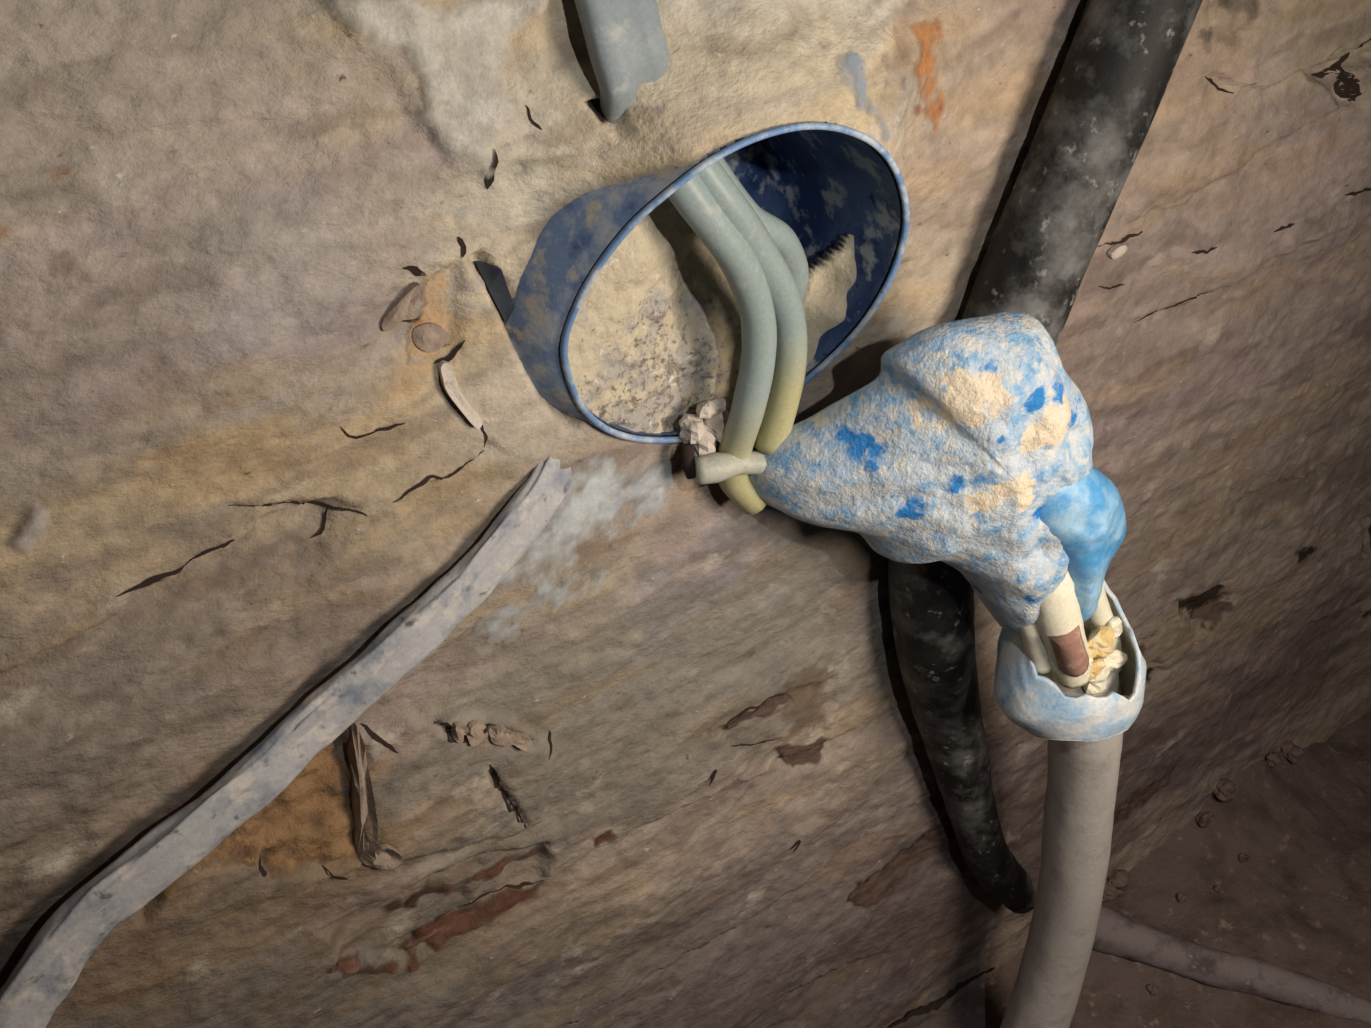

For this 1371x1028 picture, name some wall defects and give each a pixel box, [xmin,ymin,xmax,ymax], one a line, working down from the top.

rust [914,24,944,129]
crack [1311,39,1371,102]
peeling [380,266,483,429]
crack [229,423,488,538]
crack [117,539,235,597]
spalling [1179,585,1232,630]
spalling [723,670,826,766]
spalling [199,722,403,880]
spalling [595,830,617,846]
spalling [332,847,548,977]